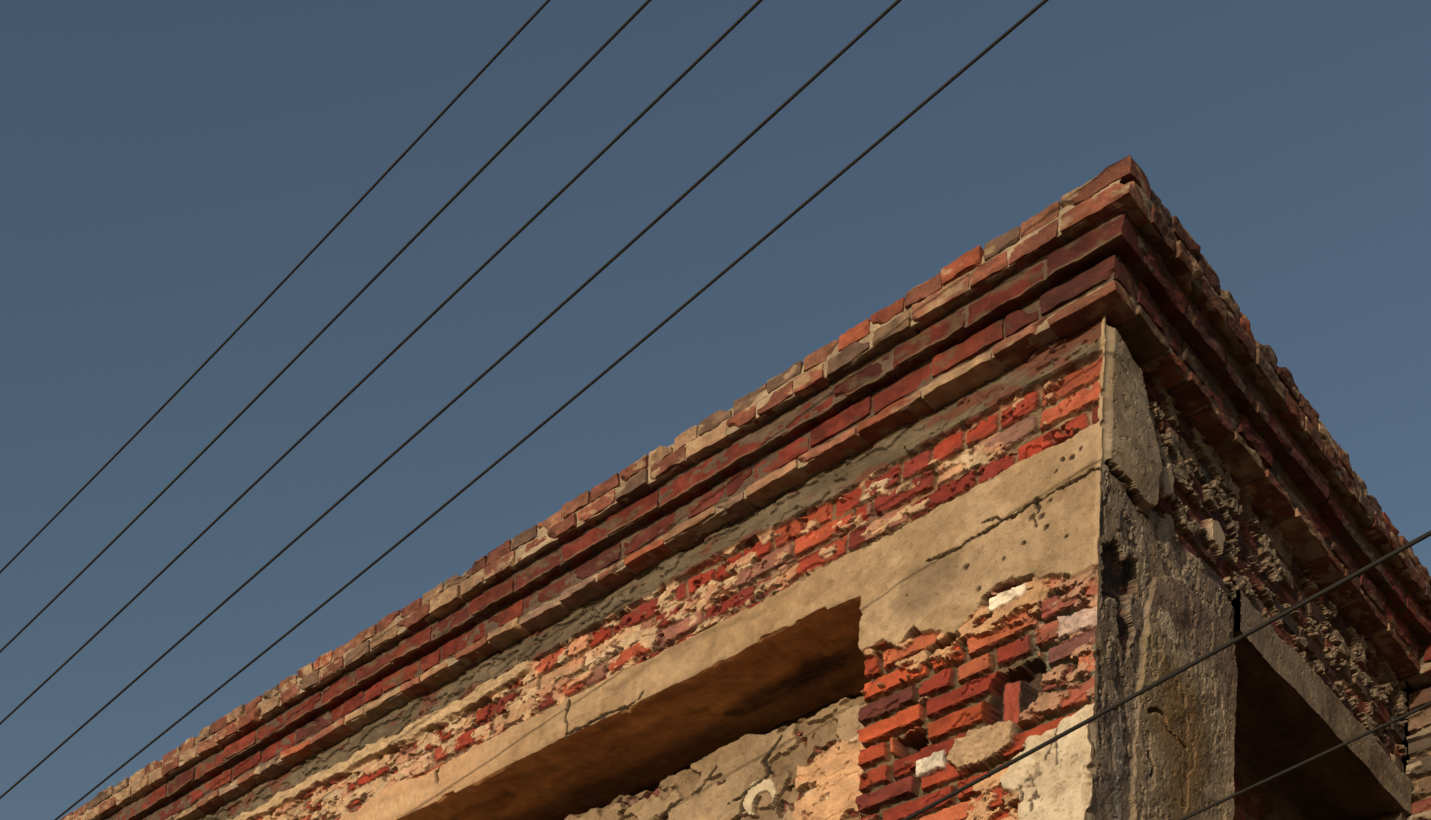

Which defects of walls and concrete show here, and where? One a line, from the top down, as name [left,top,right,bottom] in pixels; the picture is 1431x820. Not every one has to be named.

spalling [248,350,1103,820]
crack [865,509,931,546]
spalling [565,541,1273,820]
crack [926,458,1149,562]